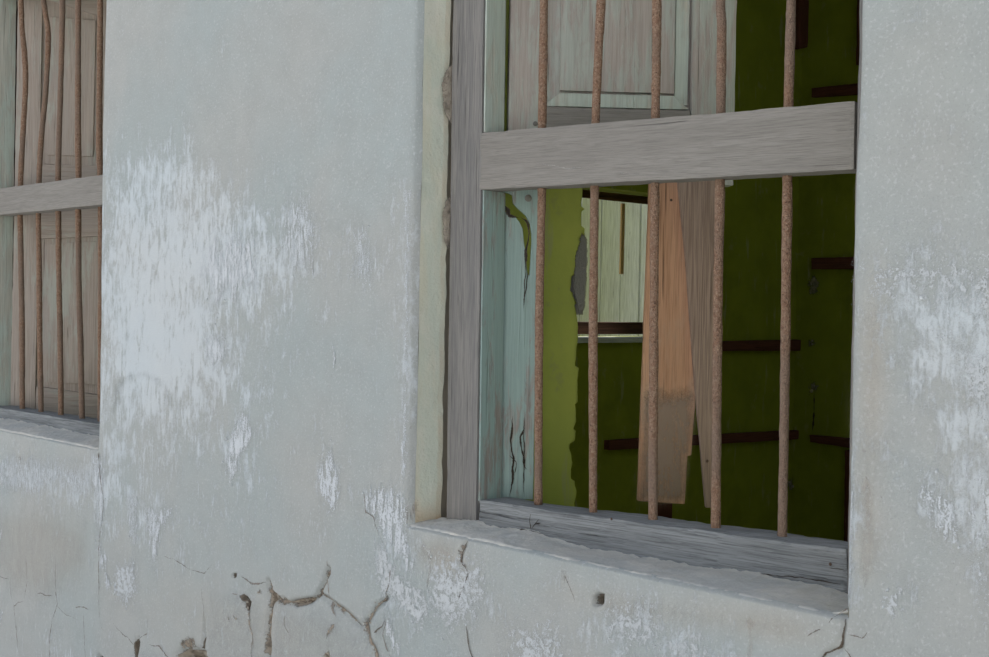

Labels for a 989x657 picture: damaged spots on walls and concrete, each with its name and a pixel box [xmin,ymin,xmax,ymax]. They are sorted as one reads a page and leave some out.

crack [458,541,468,597]
spalling [178,638,208,657]
crack [232,565,390,657]
crack [808,609,867,657]